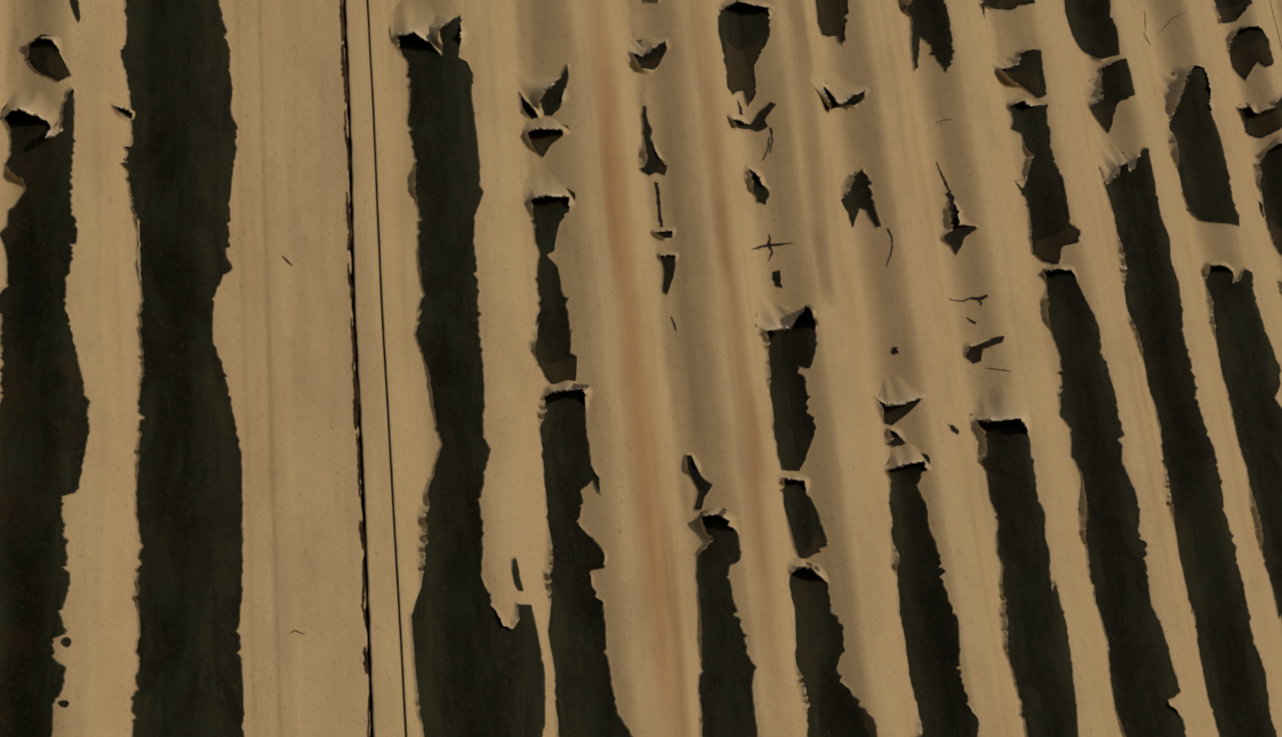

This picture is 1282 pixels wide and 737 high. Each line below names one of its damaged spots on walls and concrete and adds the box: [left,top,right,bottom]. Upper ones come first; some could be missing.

peeling [69,0,81,24]
peeling [717,0,775,107]
peeling [813,0,850,46]
peeling [0,34,92,737]
peeling [109,0,246,737]
peeling [389,0,634,737]
peeling [682,452,759,737]
peeling [753,270,878,737]
peeling [873,375,980,737]
peeling [947,386,1079,737]
peeling [991,47,1187,737]
peeling [1062,0,1282,737]